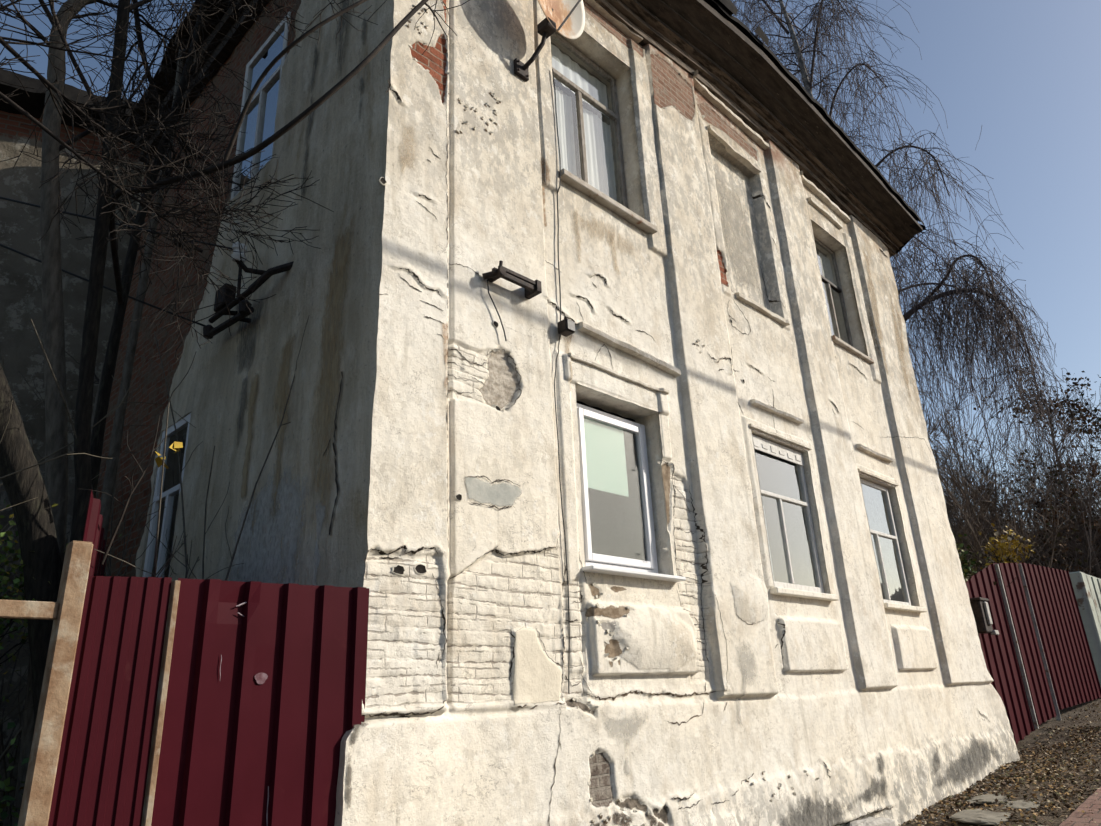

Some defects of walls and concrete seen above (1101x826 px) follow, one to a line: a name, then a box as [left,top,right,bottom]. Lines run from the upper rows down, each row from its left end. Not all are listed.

flaking render [407,0,502,135]
flaking render [583,0,758,161]
crack [379,102,522,426]
crack [550,274,652,337]
flaking render [717,250,729,287]
flaking render [480,348,520,412]
crack [323,372,343,535]
crack [364,460,786,826]
flaking render [585,582,631,667]
flaking render [588,753,669,826]
damp [782,754,886,826]
damp [933,737,1000,787]